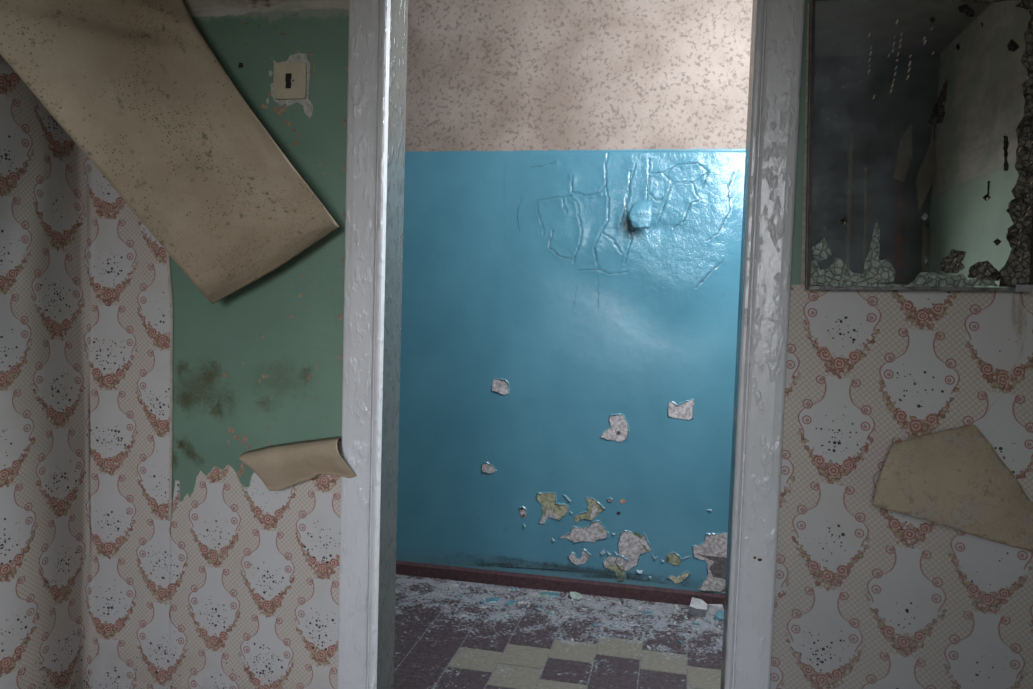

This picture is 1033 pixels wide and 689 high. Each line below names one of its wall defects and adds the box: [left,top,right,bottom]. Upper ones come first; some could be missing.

flaking render [260,27,315,153]
flaking render [800,3,810,285]
peeling [600,413,630,443]
peeling [667,399,695,421]
spalling [519,491,728,594]